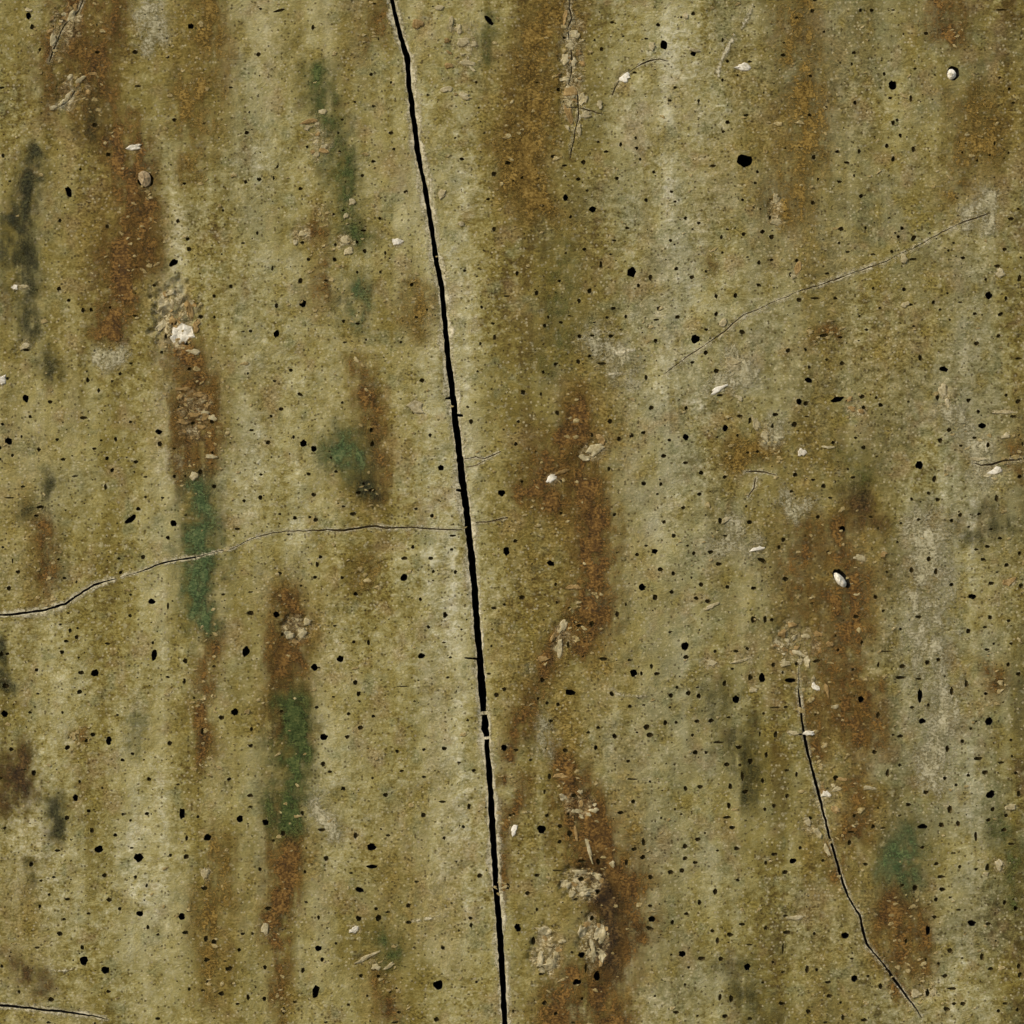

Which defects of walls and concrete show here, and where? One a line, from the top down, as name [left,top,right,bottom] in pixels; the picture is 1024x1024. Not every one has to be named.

corrosion [39,0,163,346]
corrosion [173,0,234,187]
corrosion [485,0,581,222]
corrosion [153,336,222,489]
crack [0,0,511,1024]
corrosion [263,586,311,740]
corrosion [499,384,617,899]
corrosion [260,830,305,1024]
corrosion [533,742,658,1024]
crack [796,656,923,1018]